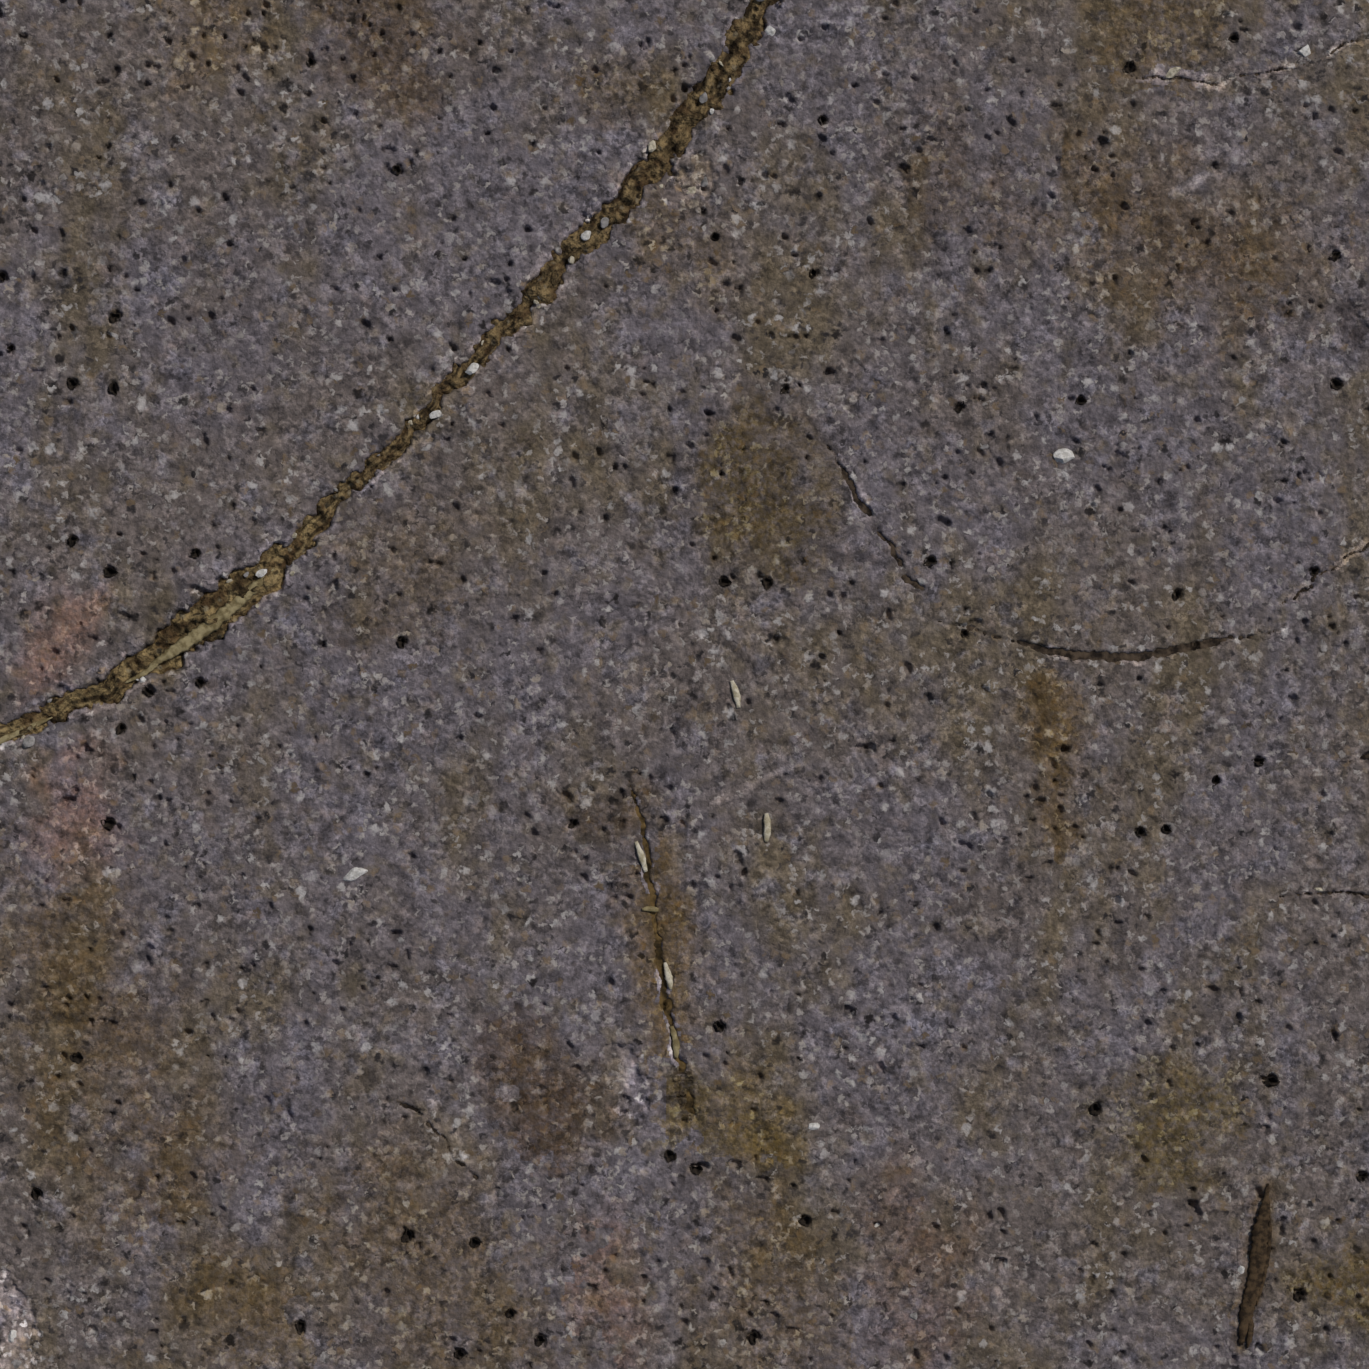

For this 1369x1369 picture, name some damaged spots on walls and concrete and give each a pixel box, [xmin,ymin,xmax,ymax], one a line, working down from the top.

crack [1131,38,1369,92]
crack [0,0,789,757]
crack [827,445,924,590]
crack [938,536,1369,667]
crack [629,780,696,1115]
crack [1279,886,1369,900]
crack [399,1103,478,1180]